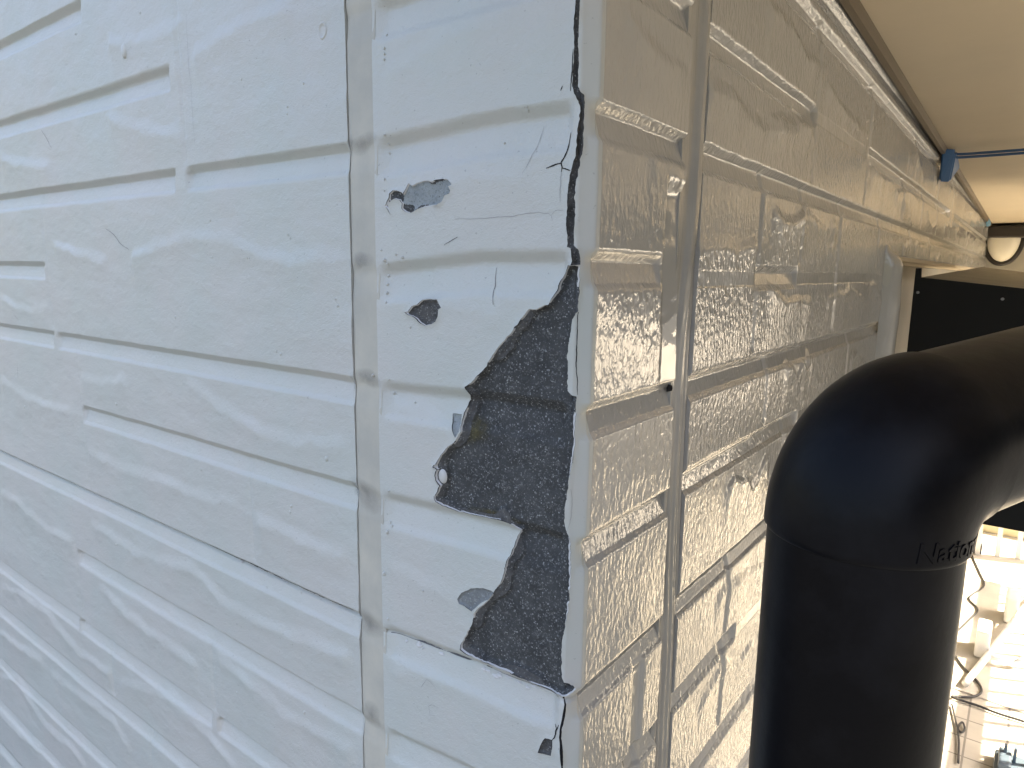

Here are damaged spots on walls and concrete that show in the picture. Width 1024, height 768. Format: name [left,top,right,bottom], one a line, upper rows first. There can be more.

peeling [383,179,451,213]
crack [477,0,585,265]
peeling [405,299,441,326]
peeling [433,265,580,696]
crack [391,632,566,768]
peeling [539,738,552,756]